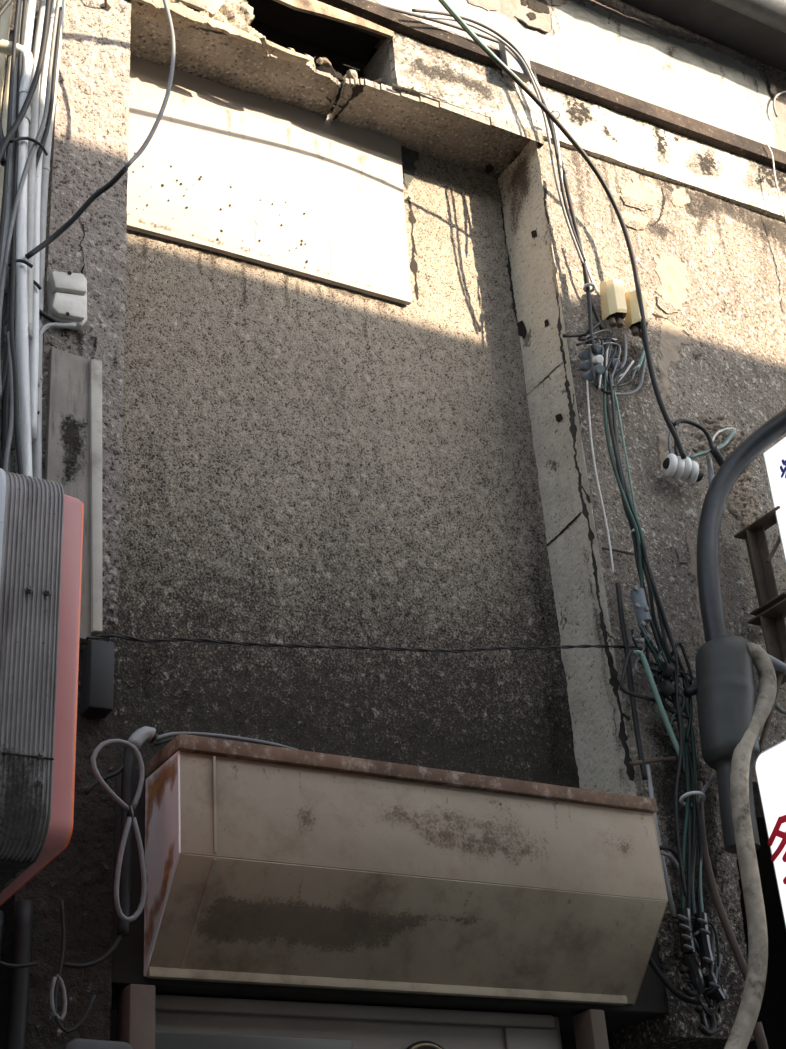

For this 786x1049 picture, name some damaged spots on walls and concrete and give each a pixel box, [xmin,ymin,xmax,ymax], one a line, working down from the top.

spalling [134,0,385,111]
leakage [565,93,618,142]
leakage [643,124,682,163]
leakage [686,151,720,178]
leakage [744,161,786,194]
crack [407,196,419,300]
crack [500,194,518,322]
crack [527,180,635,781]